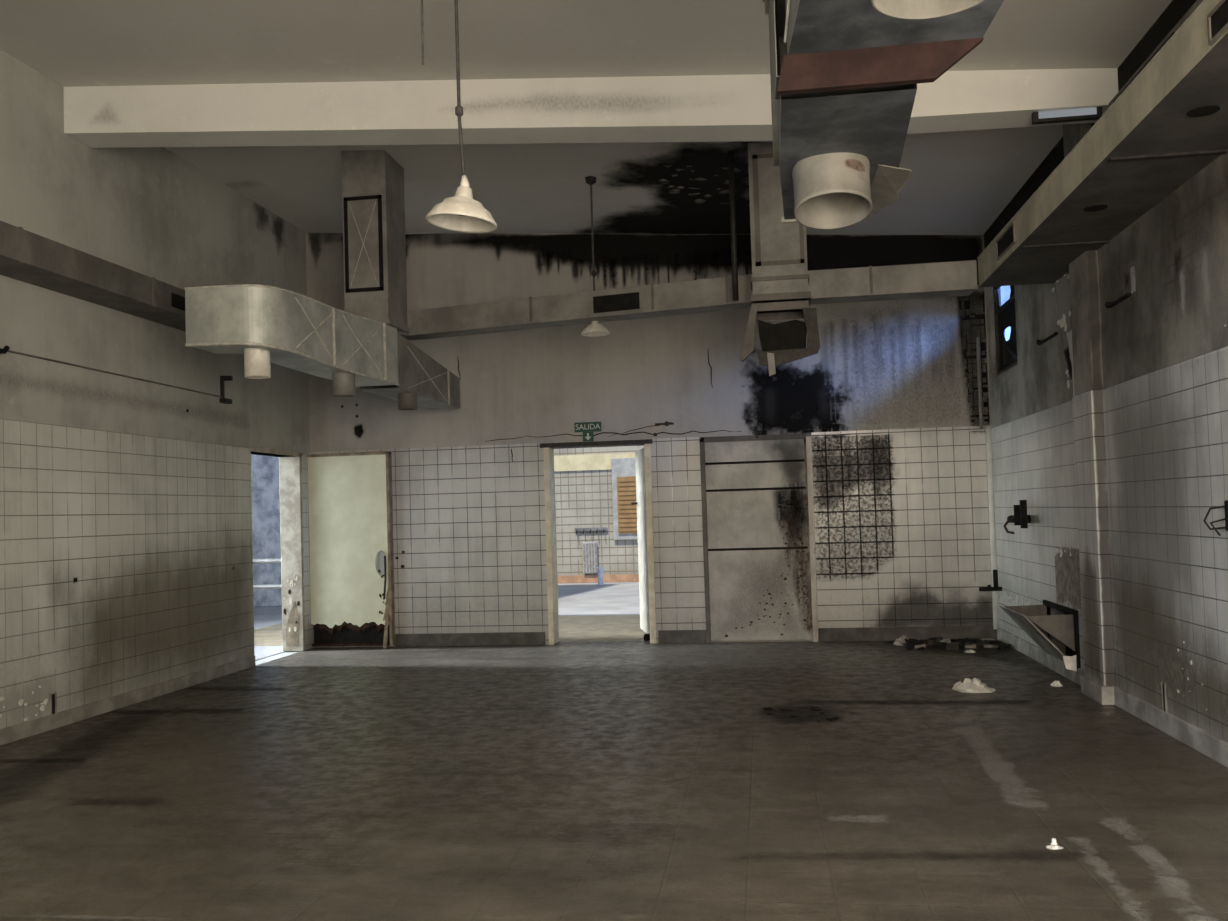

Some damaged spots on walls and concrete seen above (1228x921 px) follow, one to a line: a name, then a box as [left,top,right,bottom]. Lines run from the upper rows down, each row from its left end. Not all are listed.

water stain [536,249,752,287]
water stain [744,349,895,579]
water stain [1085,250,1228,722]